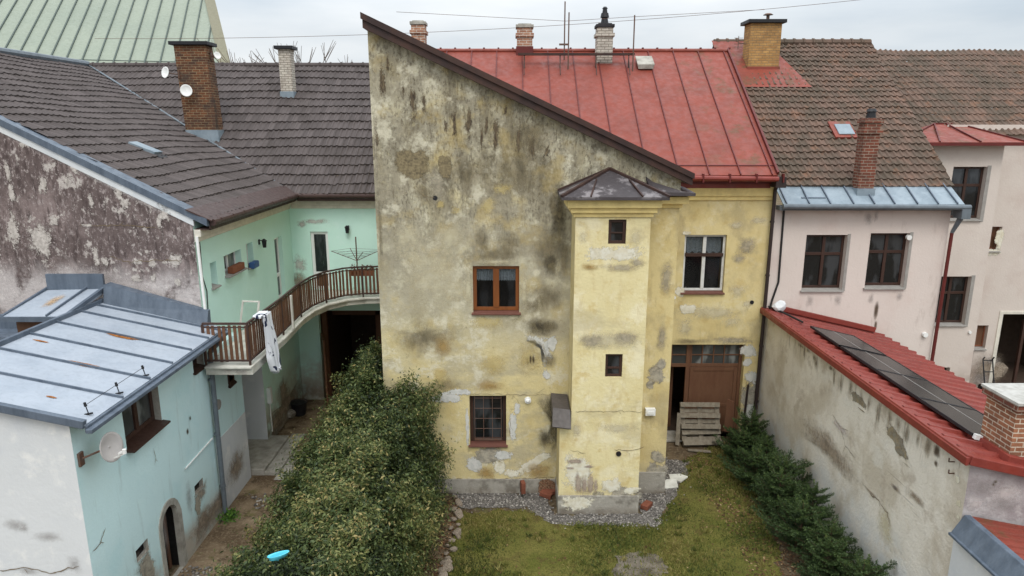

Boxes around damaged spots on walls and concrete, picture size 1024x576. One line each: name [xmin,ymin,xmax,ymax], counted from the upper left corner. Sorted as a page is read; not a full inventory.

leakage [379,58,389,101]
leakage [402,80,426,124]
leakage [444,105,507,156]
leakage [541,199,566,272]
peeling [581,233,643,261]
spalling [988,229,1004,256]
leakage [530,322,553,334]
peeling [521,333,557,379]
peeling [646,358,666,389]
peeling [432,370,642,511]
leakage [868,401,939,466]